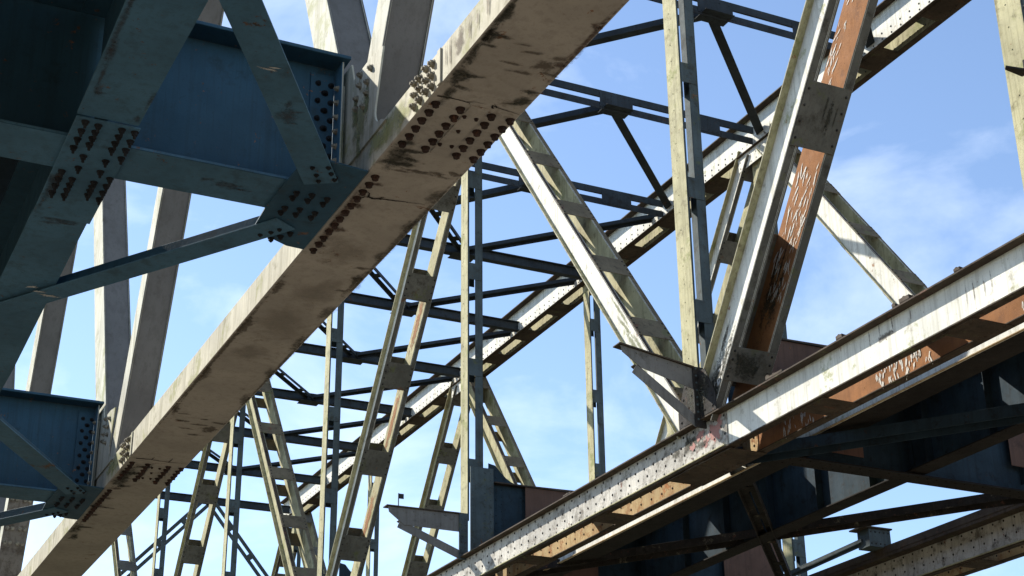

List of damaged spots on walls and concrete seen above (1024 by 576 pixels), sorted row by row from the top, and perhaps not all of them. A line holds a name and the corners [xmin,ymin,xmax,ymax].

damp [442,0,573,102]
damp [505,91,538,106]
peeling [767,163,819,301]
damp [160,276,285,436]
damp [241,338,305,403]
peeling [876,350,933,389]